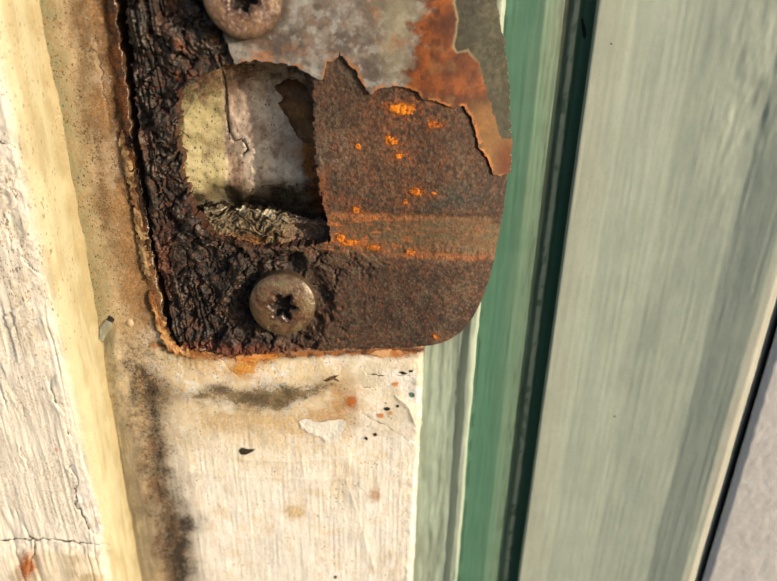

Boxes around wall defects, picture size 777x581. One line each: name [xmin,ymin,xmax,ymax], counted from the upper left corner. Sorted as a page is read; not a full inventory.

crack [88,24,108,114]
rust [385,103,416,115]
rust [70,0,166,331]
rust [302,140,324,211]
rust [336,234,383,251]
rust [149,342,377,379]
rust [391,347,424,359]
peeling [298,418,346,444]
leakage [115,341,356,581]
crack [0,468,109,559]
rust [18,552,37,579]